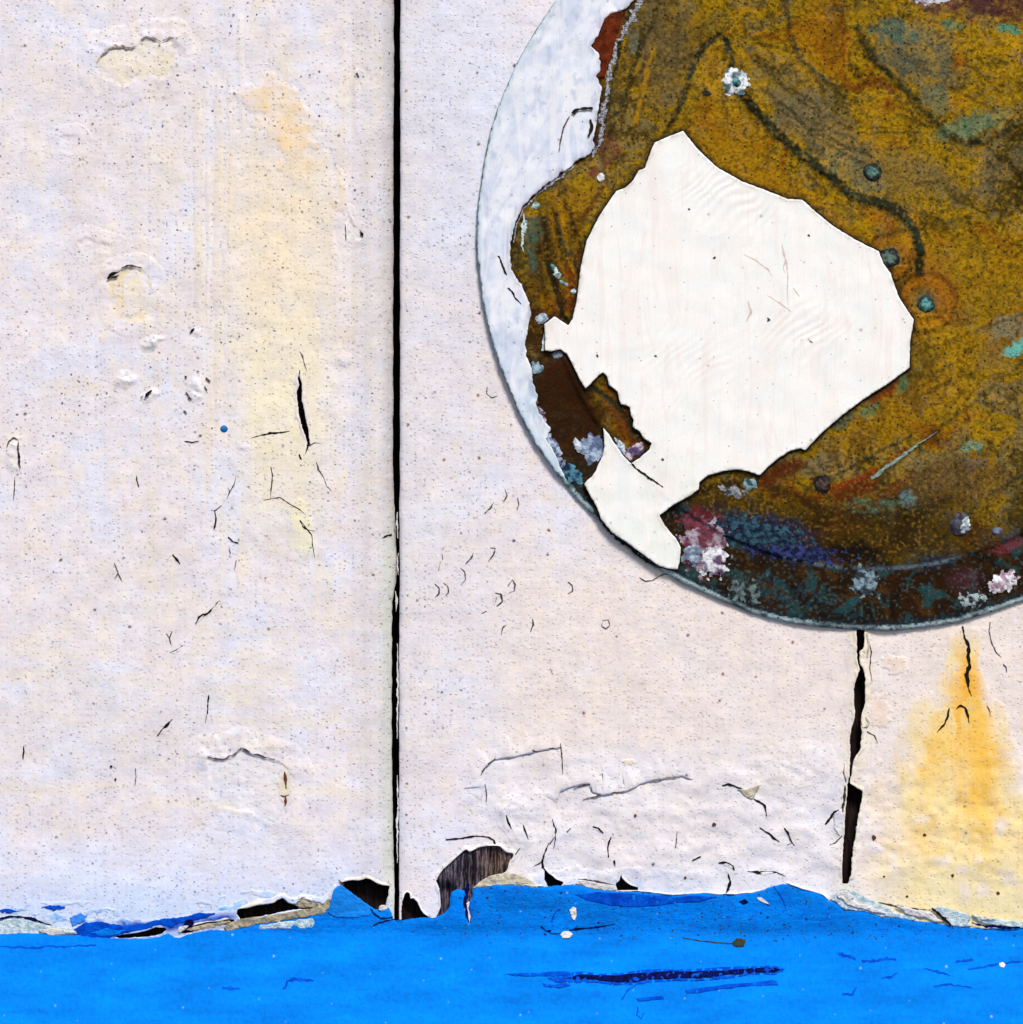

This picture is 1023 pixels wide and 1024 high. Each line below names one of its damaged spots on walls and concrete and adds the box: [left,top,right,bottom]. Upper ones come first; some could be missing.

rust [593,11,623,78]
crack [252,352,331,490]
crack [265,468,315,557]
crack [937,625,1007,732]
crack [506,815,615,865]
peeling [115,726,1023,938]
crack [675,837,785,893]
crack [722,783,795,846]
crack [825,630,878,884]
rust [830,626,1023,929]
peeling [0,915,77,936]